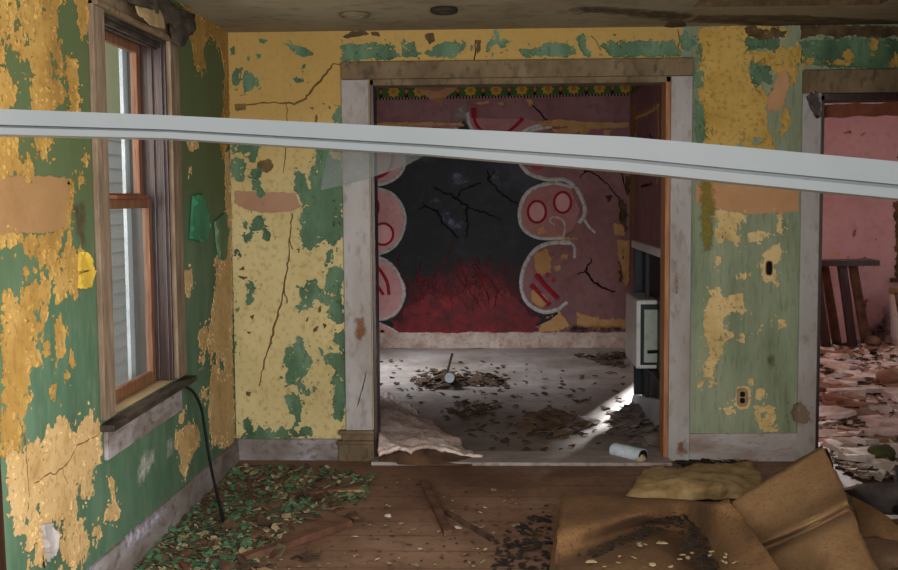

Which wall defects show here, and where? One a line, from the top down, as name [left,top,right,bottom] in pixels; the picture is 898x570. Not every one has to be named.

crack [246,63,341,121]
peeling [284,40,313,86]
peeling [340,15,898,150]
peeling [0,137,121,570]
peeling [174,143,346,482]
crack [259,213,293,386]
peeling [531,290,626,332]
crack [577,259,616,292]
crack [579,170,652,221]
peeling [605,174,635,287]
flaking render [695,182,799,391]
crack [24,432,98,497]